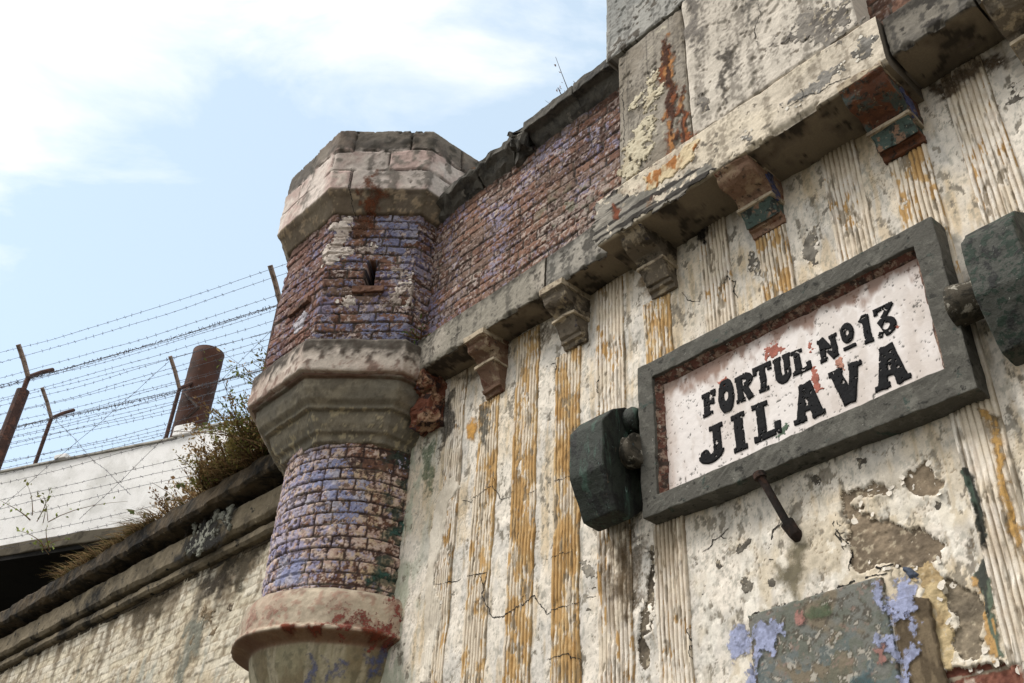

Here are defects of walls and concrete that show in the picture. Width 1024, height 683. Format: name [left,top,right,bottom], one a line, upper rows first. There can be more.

corrosion [658,33,697,155]
peeling [592,69,716,247]
corrosion [353,169,388,239]
peeling [293,215,431,340]
crack [434,561,596,618]
flaking render [740,576,754,593]
flaking render [840,460,1024,683]
corrosion [280,623,323,637]
peeling [726,618,786,683]